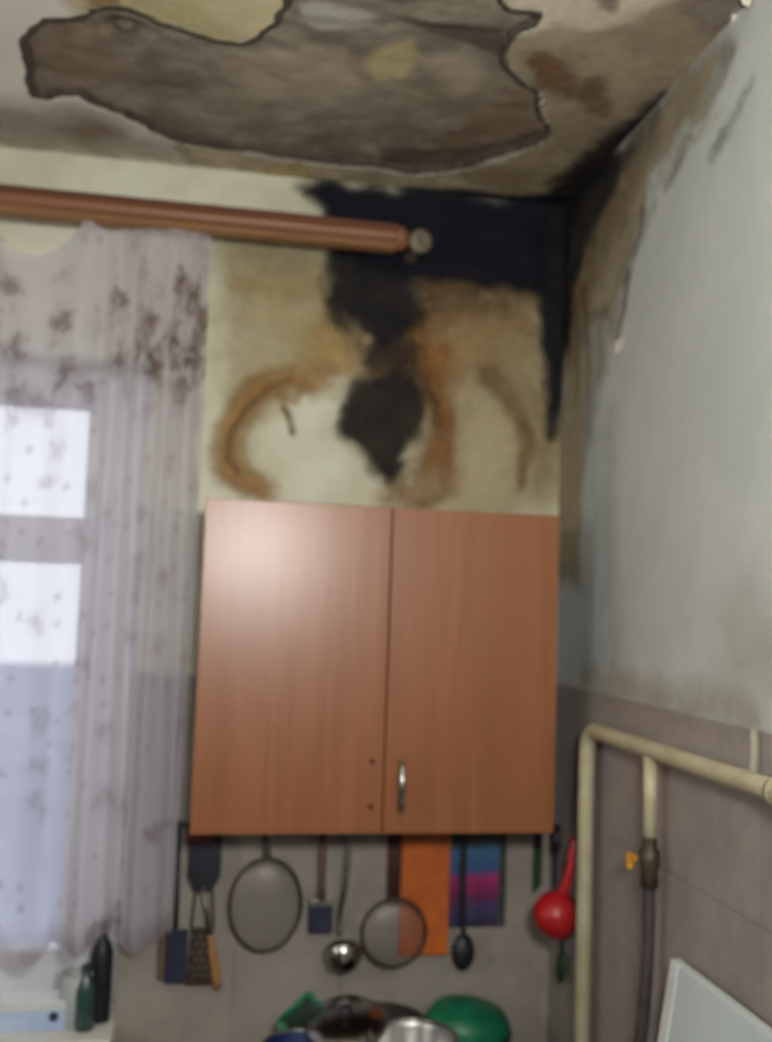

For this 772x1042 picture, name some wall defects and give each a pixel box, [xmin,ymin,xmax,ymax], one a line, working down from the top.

flaking render [18,0,752,175]
water stain [176,46,733,577]
rust [219,367,325,497]